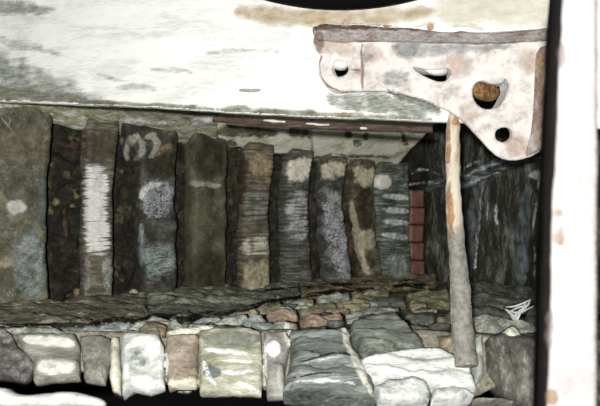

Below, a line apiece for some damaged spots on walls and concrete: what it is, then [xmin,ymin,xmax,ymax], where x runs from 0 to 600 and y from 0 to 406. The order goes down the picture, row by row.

water stain [0,2,52,14]
rust [446,117,459,164]
rust [447,185,455,238]